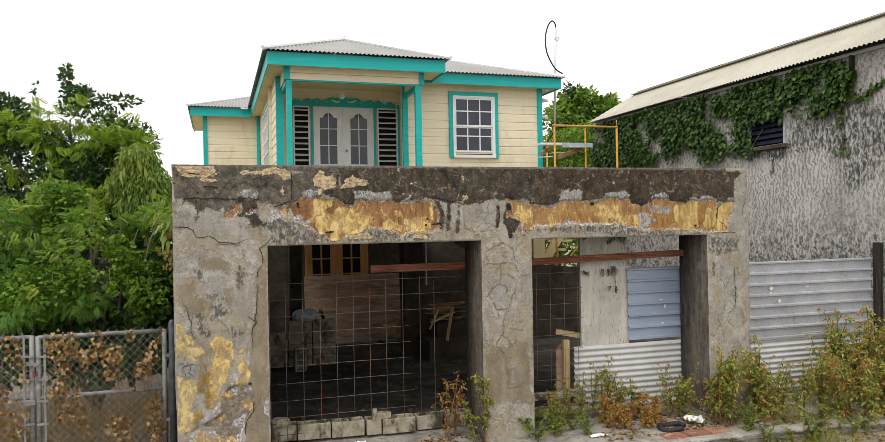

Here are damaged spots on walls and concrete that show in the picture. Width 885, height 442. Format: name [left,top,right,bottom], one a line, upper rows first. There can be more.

peeling [175,166,217,183]
crack [173,172,292,207]
flaking render [223,189,258,218]
flaking render [240,167,441,242]
flaking render [506,189,735,234]
crack [177,227,272,348]
flaking render [176,276,453,442]